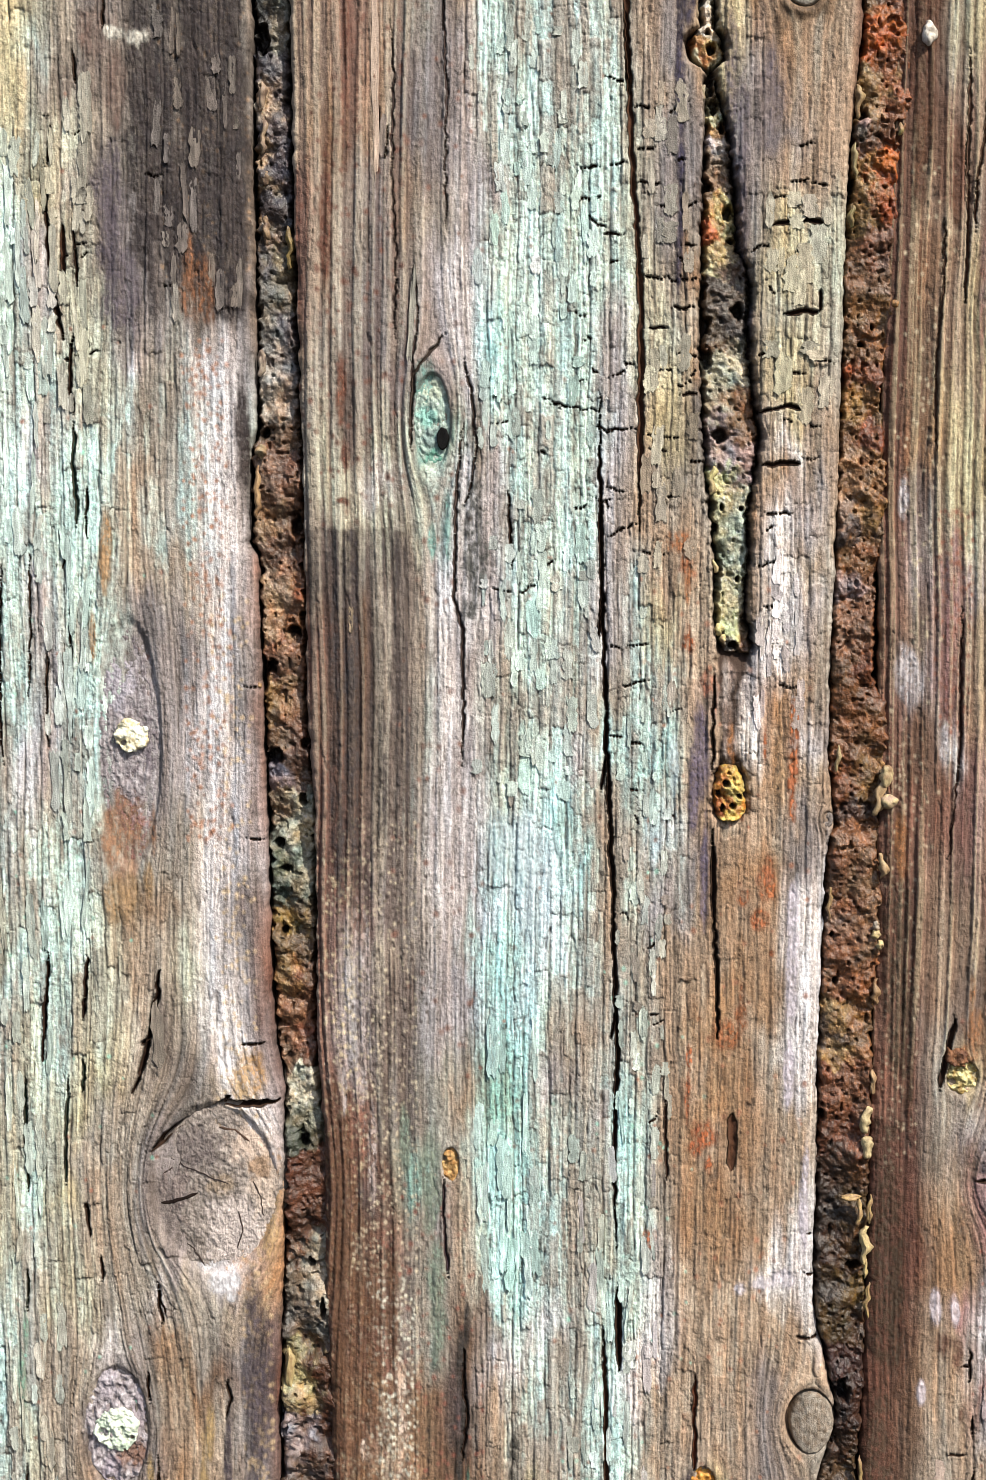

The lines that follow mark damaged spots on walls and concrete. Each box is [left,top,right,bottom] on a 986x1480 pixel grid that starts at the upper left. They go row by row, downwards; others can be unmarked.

peeling [151,77,201,323]
peeling [472,13,599,319]
peeling [641,78,694,273]
peeling [0,70,96,842]
peeling [471,488,602,807]
crack [544,0,704,1249]
crack [666,675,716,770]
crack [131,969,161,1094]
peeling [473,1013,543,1300]
peeling [568,833,672,1394]
crack [711,829,720,1038]
crack [602,1287,622,1480]